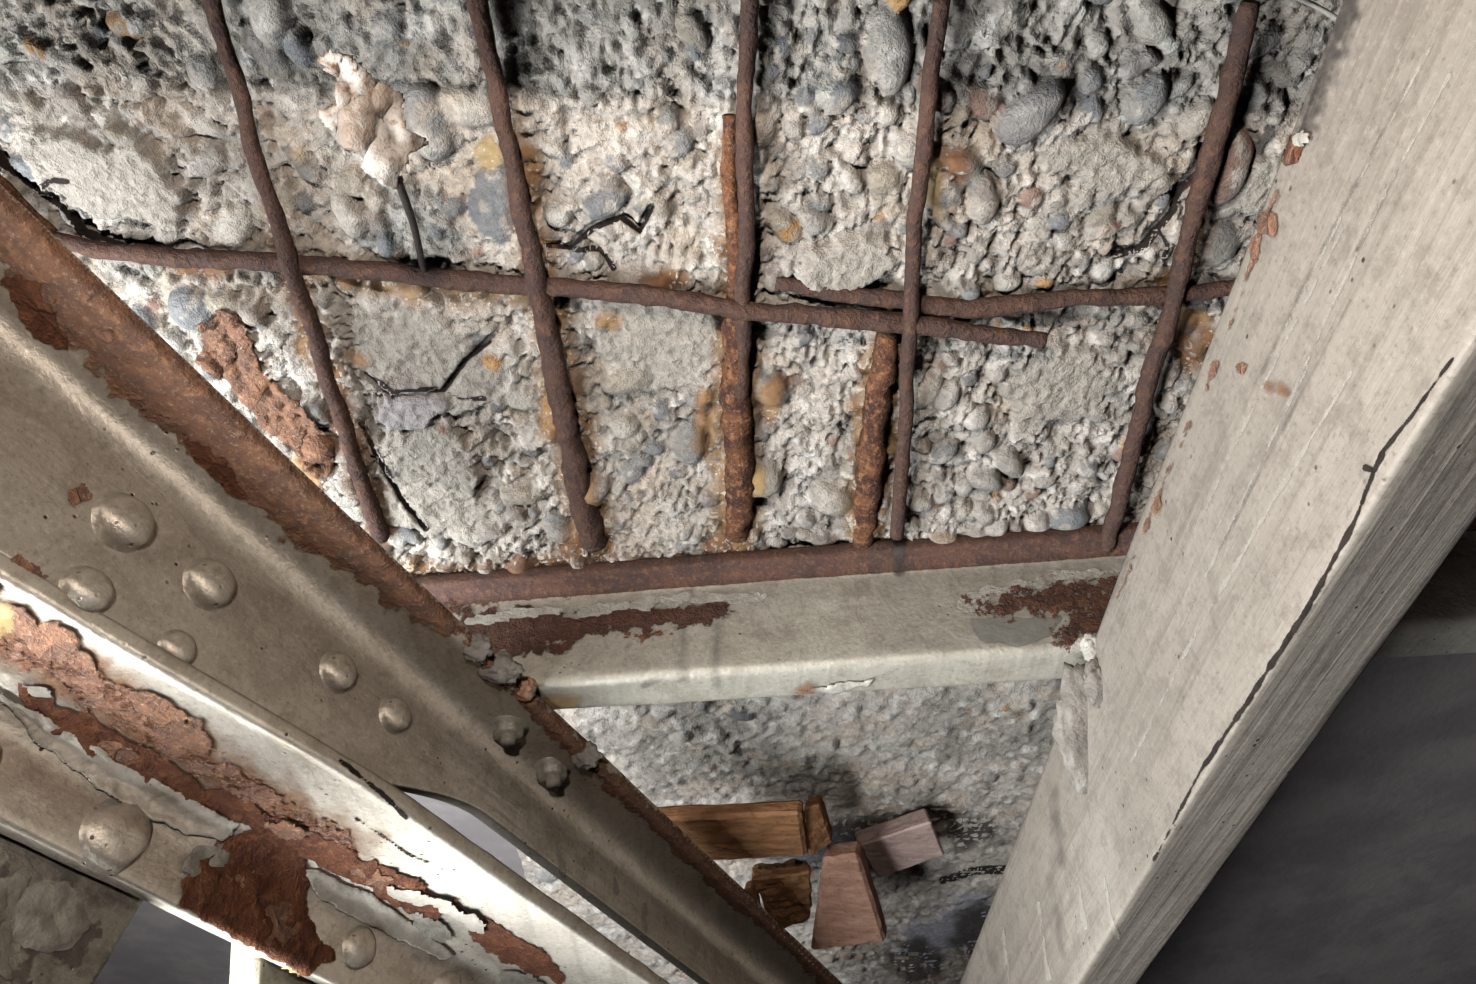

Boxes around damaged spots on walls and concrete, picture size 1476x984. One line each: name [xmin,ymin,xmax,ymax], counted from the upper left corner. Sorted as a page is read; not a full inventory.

corrosion [928,147,970,207]
corrosion [1282,134,1304,166]
corrosion [0,185,777,669]
spalling [0,0,1357,576]
corrosion [749,351,782,420]
corrosion [848,340,899,543]
corrosion [1174,190,1279,391]
corrosion [956,556,1135,658]
crack [1152,357,1454,861]
peeling [0,686,240,841]
corrosion [0,591,565,984]
corrosion [497,678,840,984]